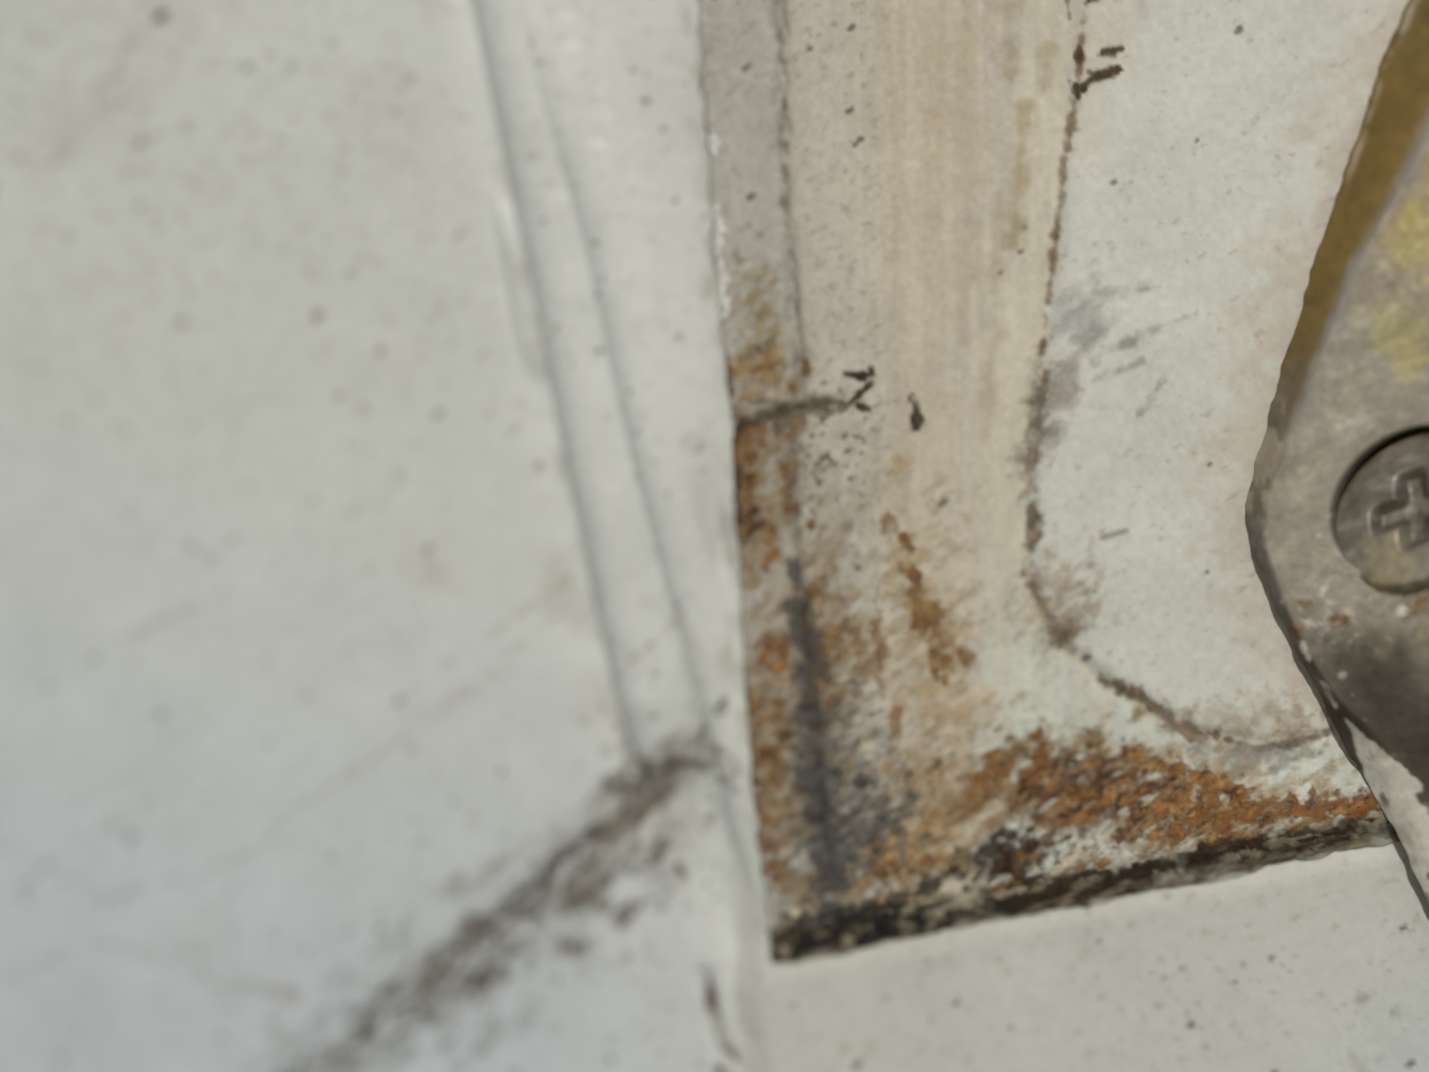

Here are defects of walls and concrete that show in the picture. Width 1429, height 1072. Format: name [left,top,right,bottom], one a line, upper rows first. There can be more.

peeling [711,205,738,426]
rust [728,261,1381,903]
rust [1280,565,1415,662]